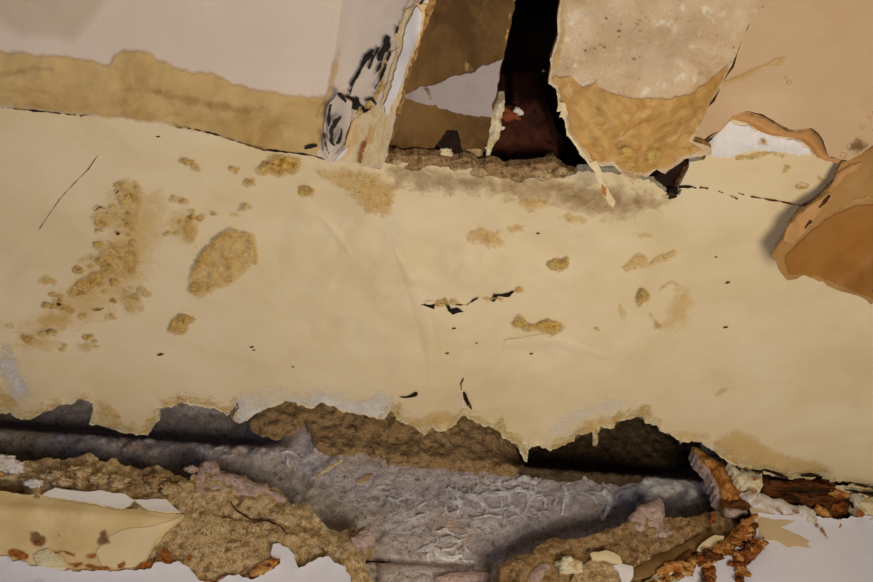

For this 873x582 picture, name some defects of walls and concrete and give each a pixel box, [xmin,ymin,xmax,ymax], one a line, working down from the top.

leakage [0,26,400,156]
flaking render [385,91,575,183]
spalling [674,158,689,188]
peeling [705,111,873,305]
flaking render [231,392,700,487]
flaking render [0,452,375,582]
flaking render [392,463,826,582]
rust [645,447,769,582]
flaking render [835,484,873,522]